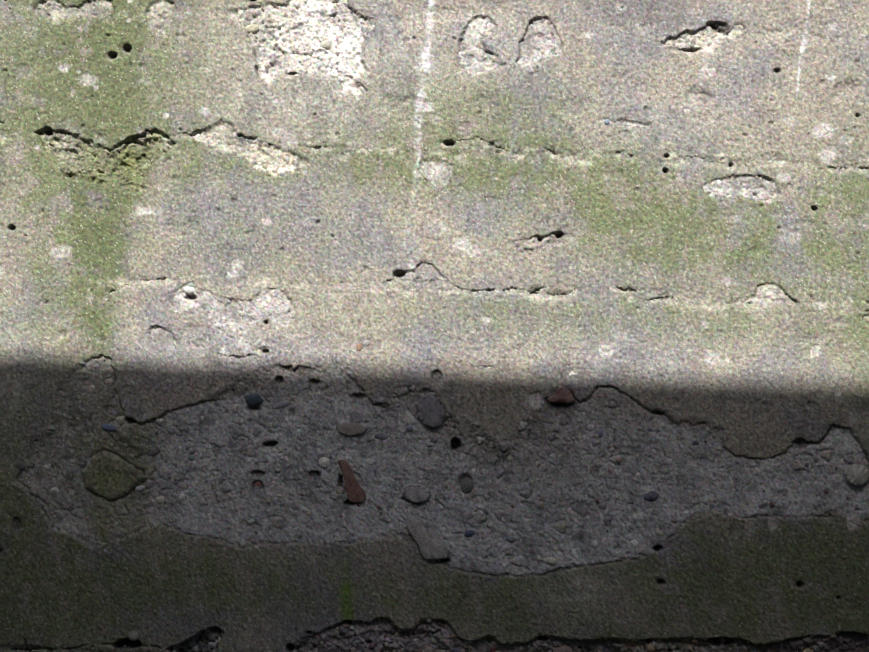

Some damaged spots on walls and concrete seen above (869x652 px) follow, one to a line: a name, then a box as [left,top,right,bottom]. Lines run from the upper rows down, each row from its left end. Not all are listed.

spalling [226,0,376,103]
spalling [456,15,565,79]
spalling [658,21,749,60]
spalling [34,128,169,188]
spalling [189,117,318,179]
spalling [704,174,785,208]
crack [471,285,567,298]
spalling [11,281,869,580]
crack [24,639,90,652]
spalling [290,617,869,652]